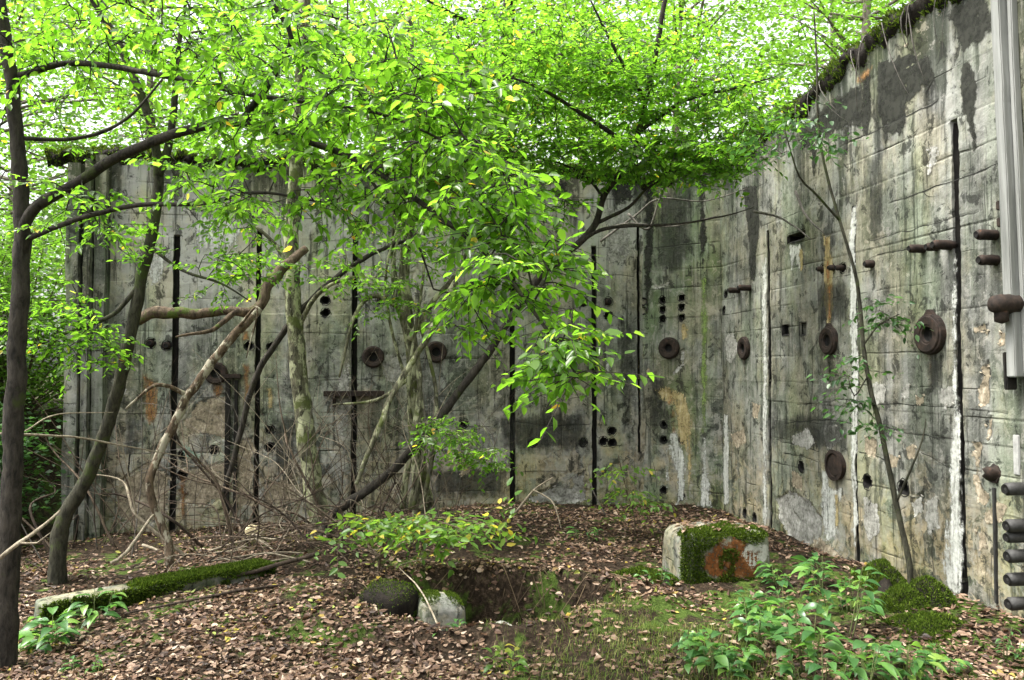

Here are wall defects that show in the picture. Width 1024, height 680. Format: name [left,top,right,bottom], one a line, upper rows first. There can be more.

damp [949,0,992,151]
damp [800,54,934,238]
rust [823,236,834,323]
damp [742,185,859,547]
rust [655,386,692,485]
efflorescence [666,431,687,505]
spalling [777,471,822,545]